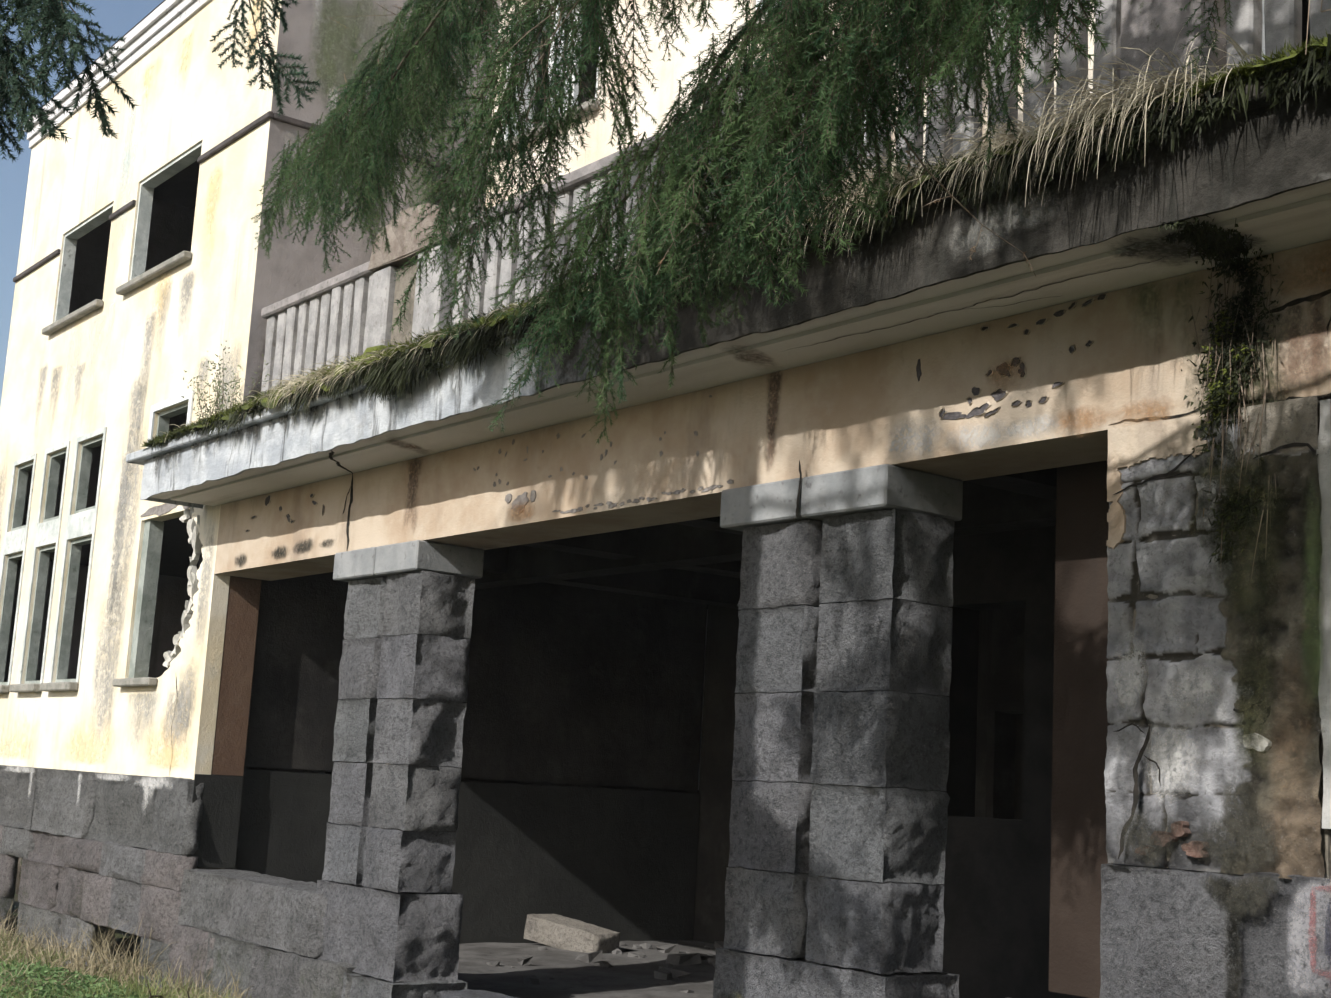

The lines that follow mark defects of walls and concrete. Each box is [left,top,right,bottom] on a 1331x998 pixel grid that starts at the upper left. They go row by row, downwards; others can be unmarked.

water stain [144,275,193,366]
peeling [1007,294,1107,335]
crack [1259,289,1331,334]
water stain [736,349,781,458]
peeling [939,357,1065,420]
crack [329,450,353,549]
spalling [493,473,537,513]
peeling [552,479,734,514]
flaking render [140,503,202,668]
water stain [95,392,372,726]
water stain [142,669,193,799]
crack [1113,723,1161,859]